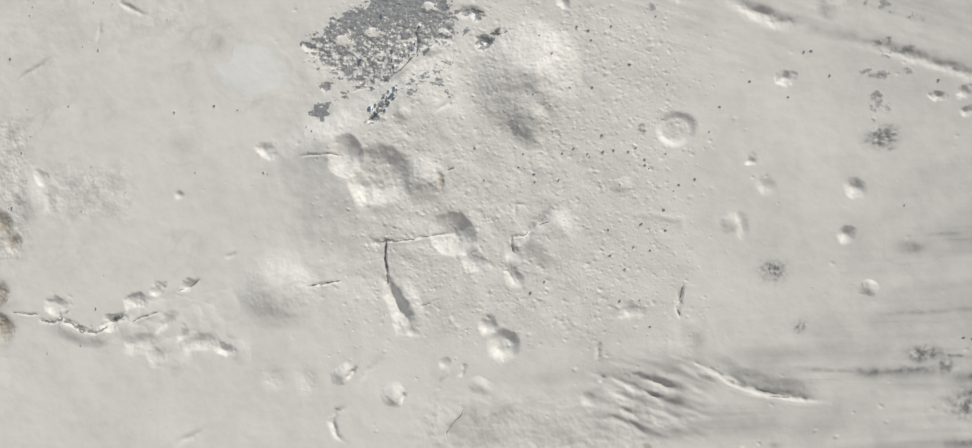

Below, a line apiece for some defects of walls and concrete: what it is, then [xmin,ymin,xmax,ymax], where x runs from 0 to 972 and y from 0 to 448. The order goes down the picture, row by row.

peeling [292,0,511,126]
crack [381,234,441,284]
crack [13,312,157,333]